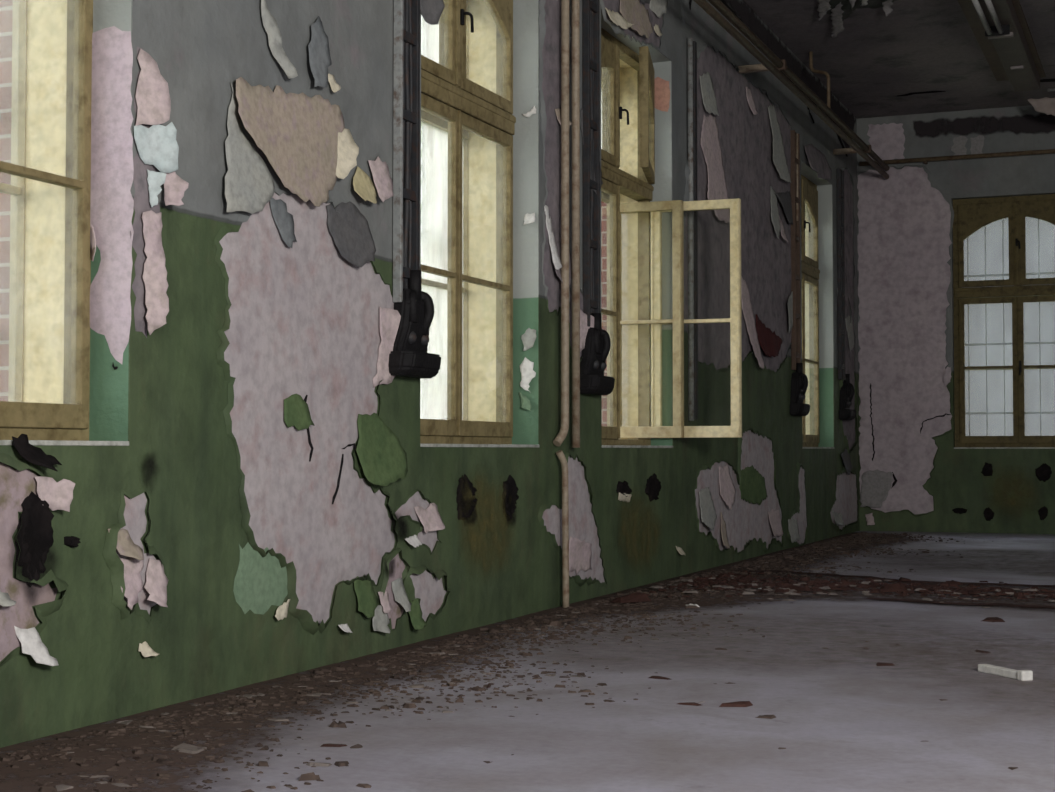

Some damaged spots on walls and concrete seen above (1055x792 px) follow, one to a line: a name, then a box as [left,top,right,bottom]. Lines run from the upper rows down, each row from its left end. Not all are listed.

peeling [90,26,189,370]
spalling [214,0,450,635]
peeling [519,328,537,411]
spalling [522,0,594,364]
spalling [683,44,798,374]
spalling [829,123,954,532]
peeling [1028,97,1055,116]
spalling [0,434,75,667]
peeling [102,487,169,624]
peeling [138,641,159,657]
spalling [538,451,607,588]
spalling [694,428,808,555]